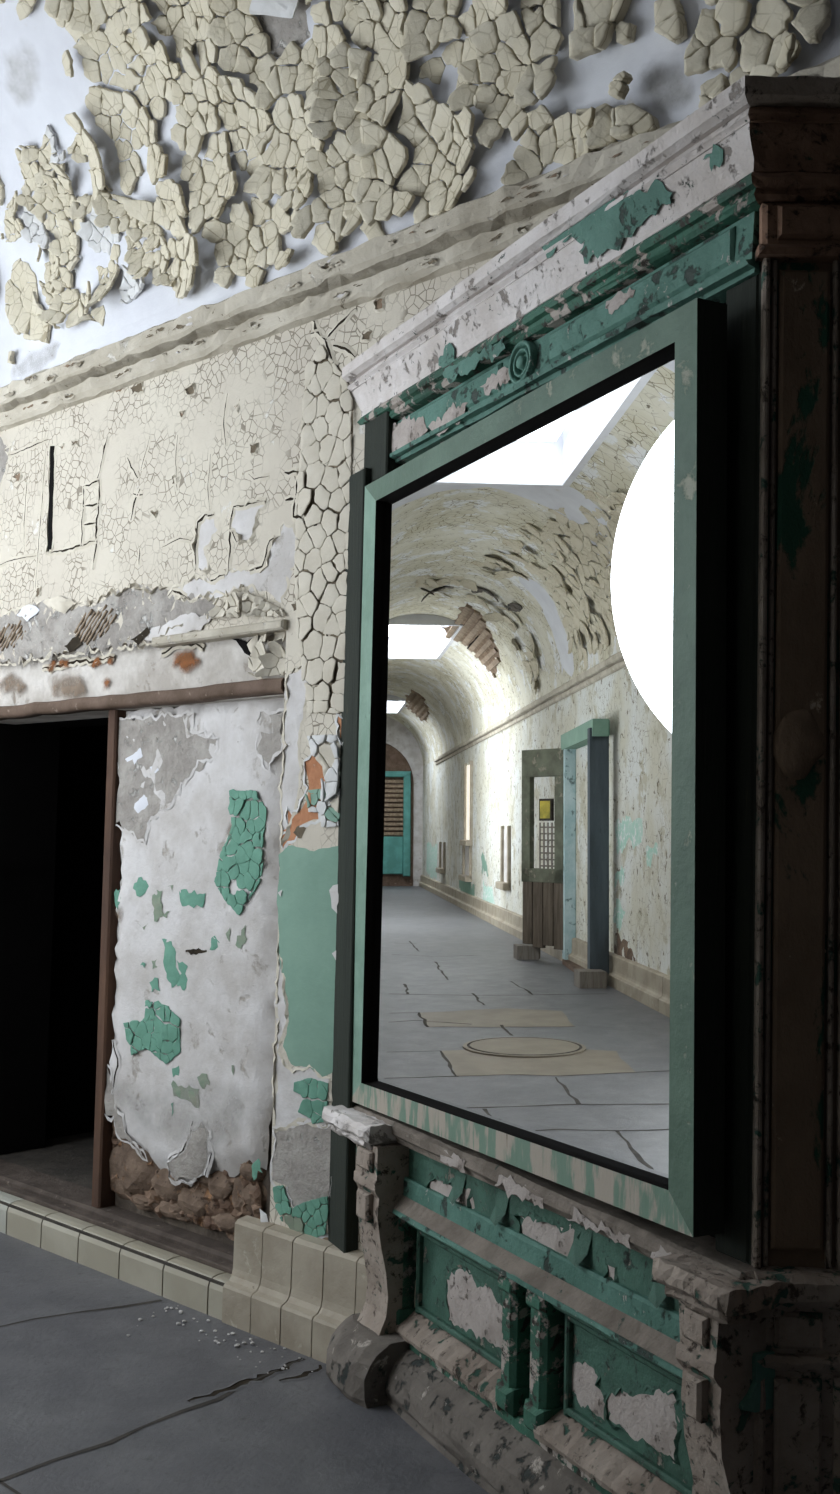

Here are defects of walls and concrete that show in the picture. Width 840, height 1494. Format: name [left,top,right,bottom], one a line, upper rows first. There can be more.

peeling [0,0,832,492]
crack [0,306,357,715]
spalling [0,499,343,915]
spalling [109,943,333,1241]
peeling [429,1150,475,1209]
peeling [495,1175,630,1256]
peeling [650,1245,672,1259]
peeling [447,1269,502,1350]
crack [185,1358,326,1403]
peeling [572,1362,680,1463]